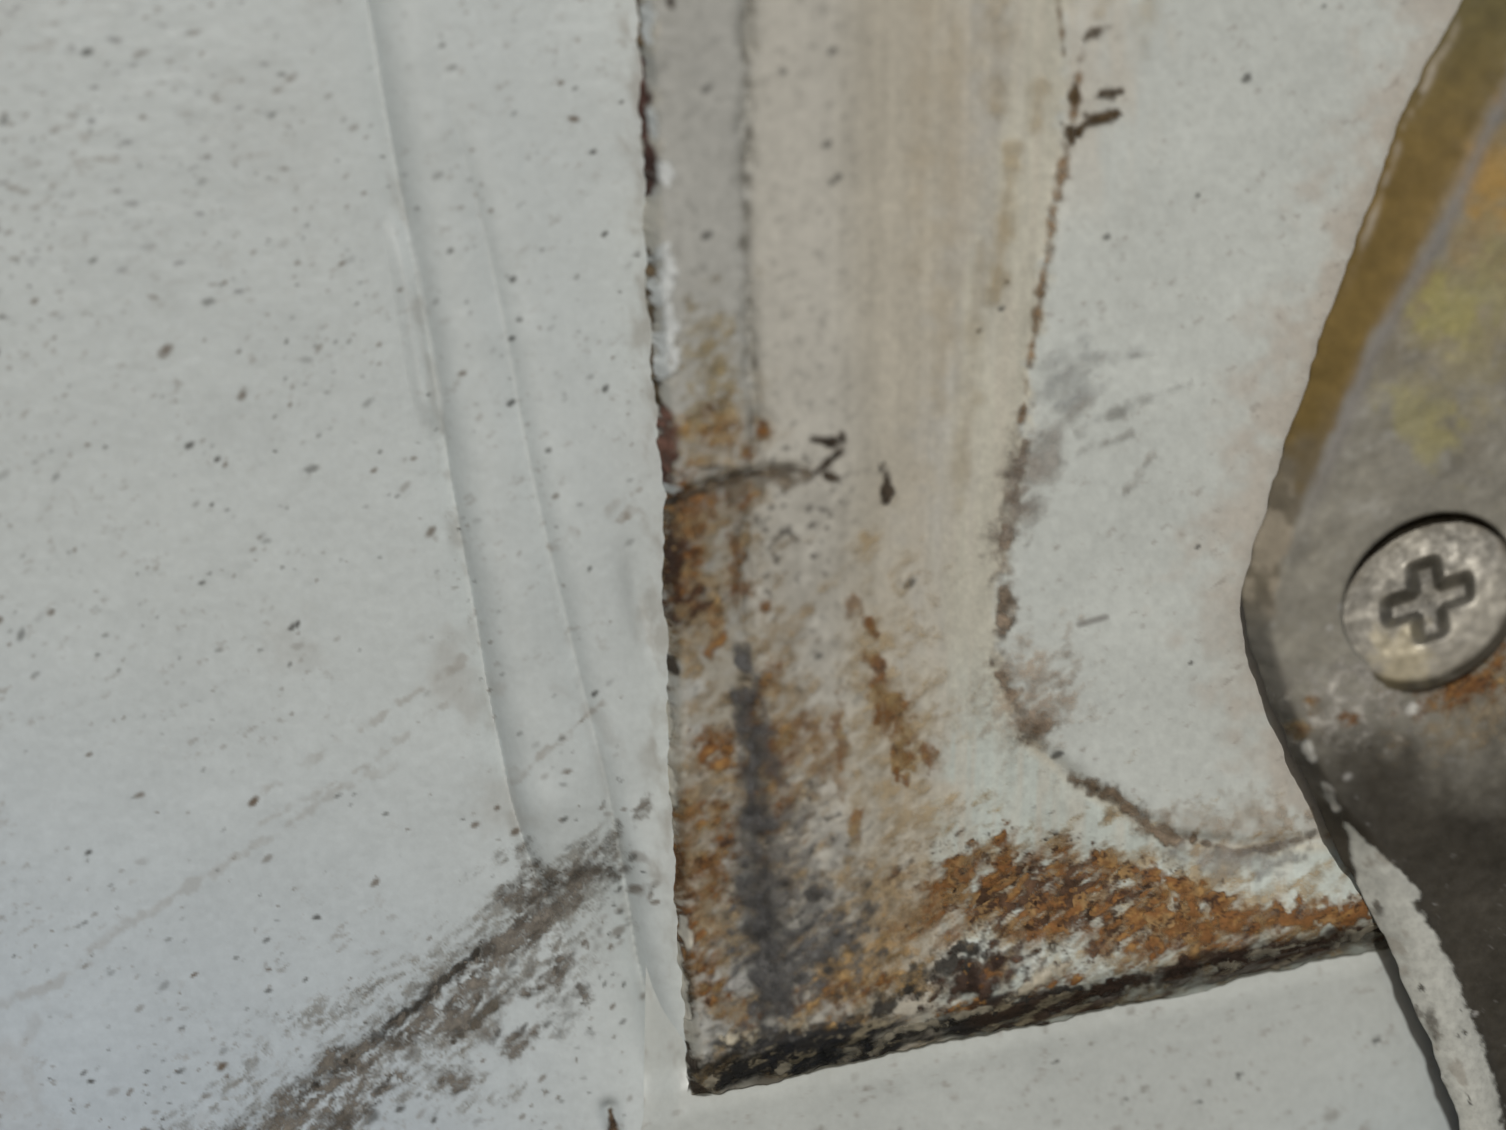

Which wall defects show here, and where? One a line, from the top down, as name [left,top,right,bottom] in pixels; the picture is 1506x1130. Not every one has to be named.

peeling [636,0,675,196]
peeling [645,243,682,494]
rust [662,323,1371,1029]
rust [1284,644,1506,763]